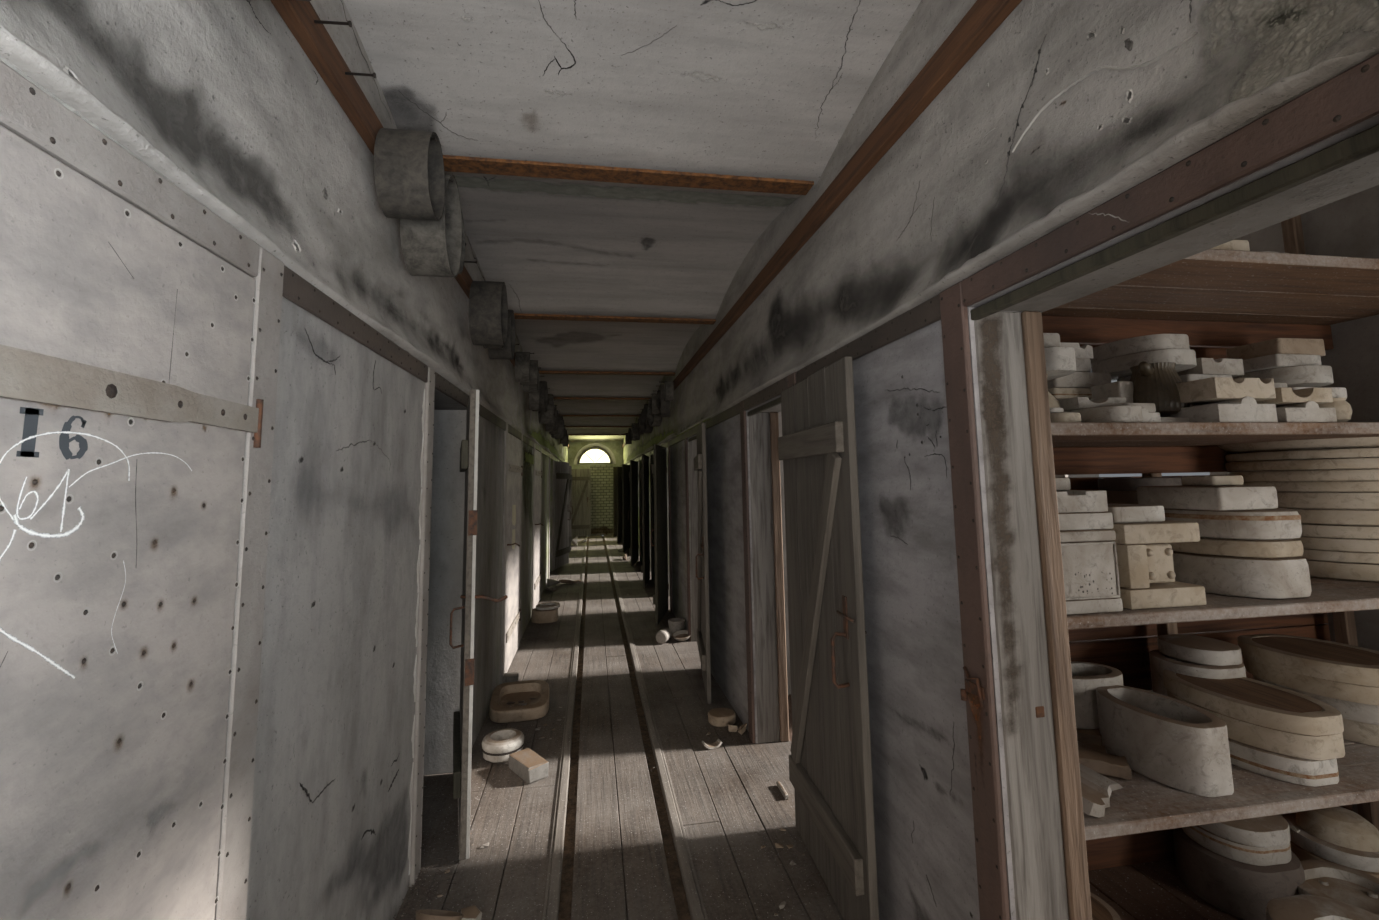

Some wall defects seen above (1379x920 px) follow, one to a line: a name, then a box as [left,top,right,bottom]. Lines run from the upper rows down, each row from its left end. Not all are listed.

crack [538,0,576,75]
crack [621,0,757,56]
crack [815,1,861,139]
flaking render [1202,0,1379,102]